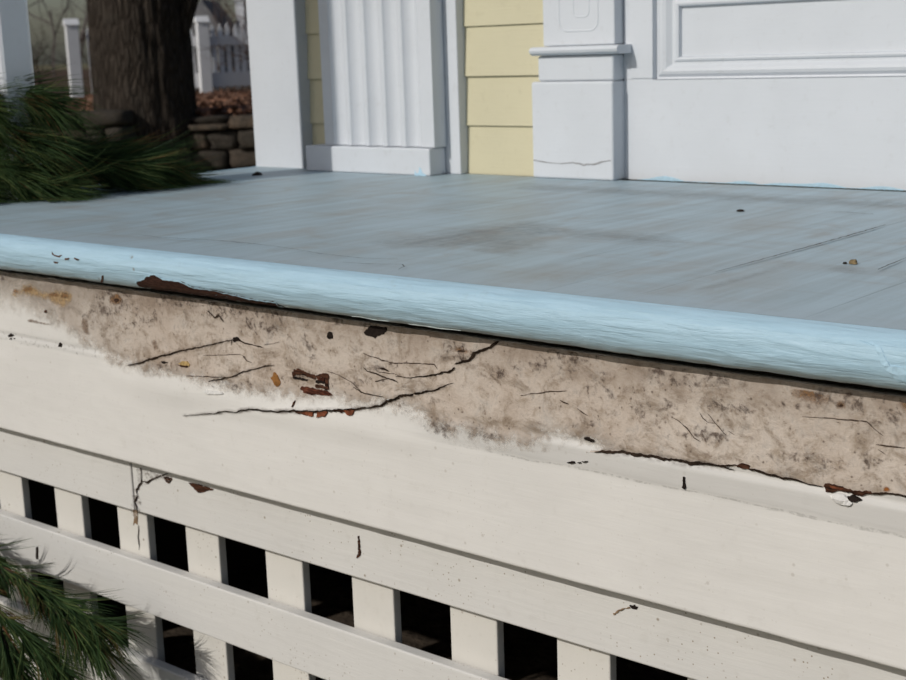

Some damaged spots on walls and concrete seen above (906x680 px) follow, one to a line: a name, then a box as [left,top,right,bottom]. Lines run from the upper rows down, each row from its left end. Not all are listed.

peeling [316,410,355,418]
crack [185,341,499,416]
water stain [37,277,906,495]
crack [594,412,822,487]
crack [133,468,172,544]
spalling [189,483,214,493]
crack [871,490,906,498]